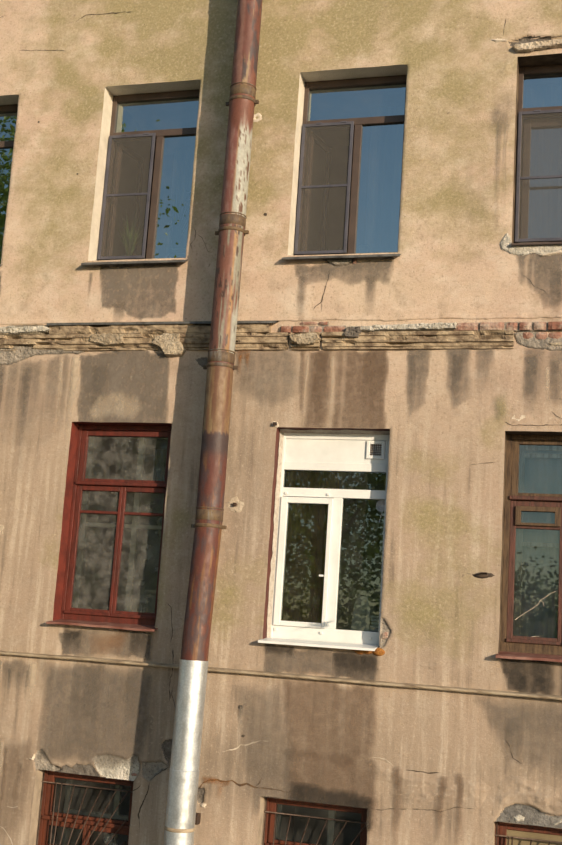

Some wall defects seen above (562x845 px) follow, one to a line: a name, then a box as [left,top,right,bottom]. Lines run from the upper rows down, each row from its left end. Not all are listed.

peeling [491,35,562,53]
flaking render [280,321,562,351]
water stain [72,350,169,423]
water stain [302,350,388,428]
water stain [449,349,469,383]
water stain [527,351,538,385]
water stain [266,645,377,830]
spalling [26,739,172,781]
crack [131,767,168,826]
spalling [496,804,562,829]